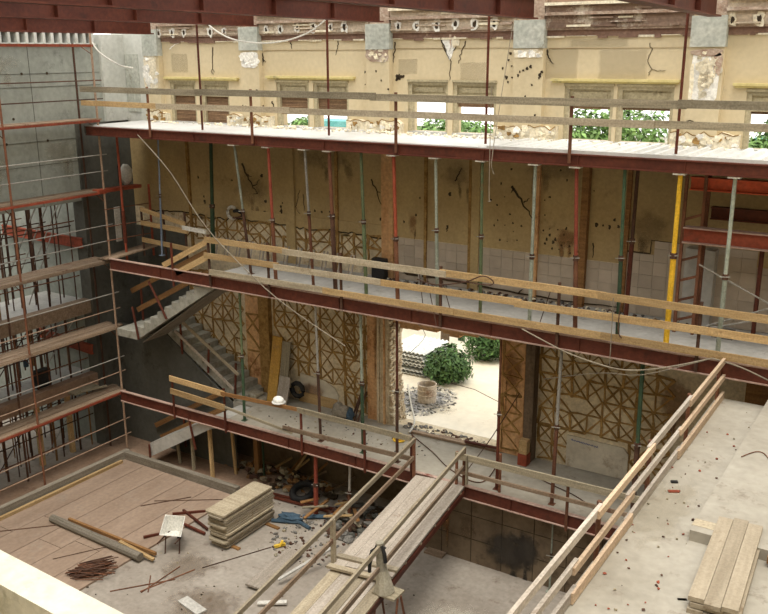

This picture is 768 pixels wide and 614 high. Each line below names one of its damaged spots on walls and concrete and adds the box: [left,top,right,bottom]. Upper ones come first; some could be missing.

flaking render [142,56,159,88]
flaking render [239,52,260,68]
flaking render [364,49,389,91]
crack [423,41,466,79]
flaking render [688,49,723,100]
flaking render [346,119,404,134]
flaking render [669,131,741,149]
crack [241,163,259,194]
crack [511,185,532,218]
damp [487,534,537,581]